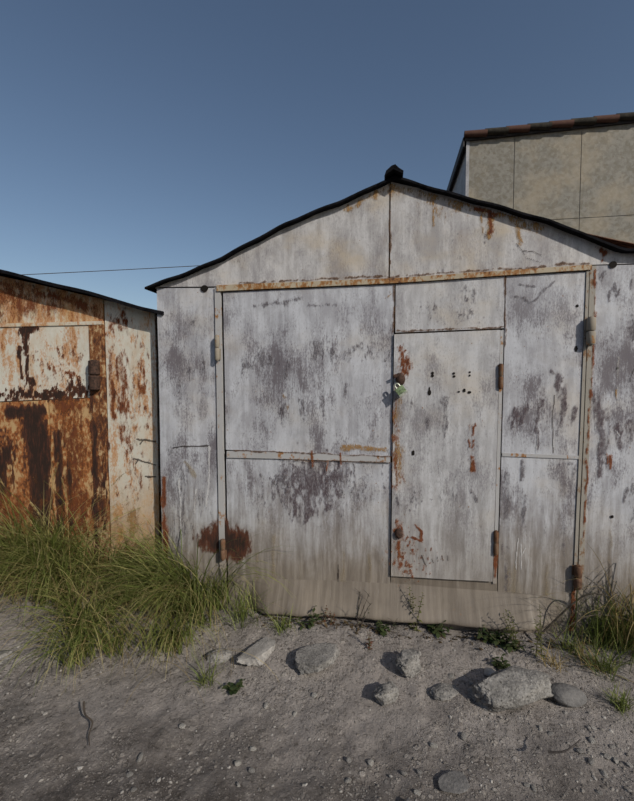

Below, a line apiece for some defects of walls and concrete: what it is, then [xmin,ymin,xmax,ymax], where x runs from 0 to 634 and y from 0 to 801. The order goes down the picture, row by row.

rust [317,275,400,297]
rust [393,265,546,346]
rust [399,345,411,375]
rust [0,280,151,568]
peeling [509,399,545,450]
peeling [551,370,578,435]
rust [583,345,595,541]
peeling [592,396,634,478]
peeling [259,449,366,523]
rust [192,520,252,564]
rust [389,519,432,582]